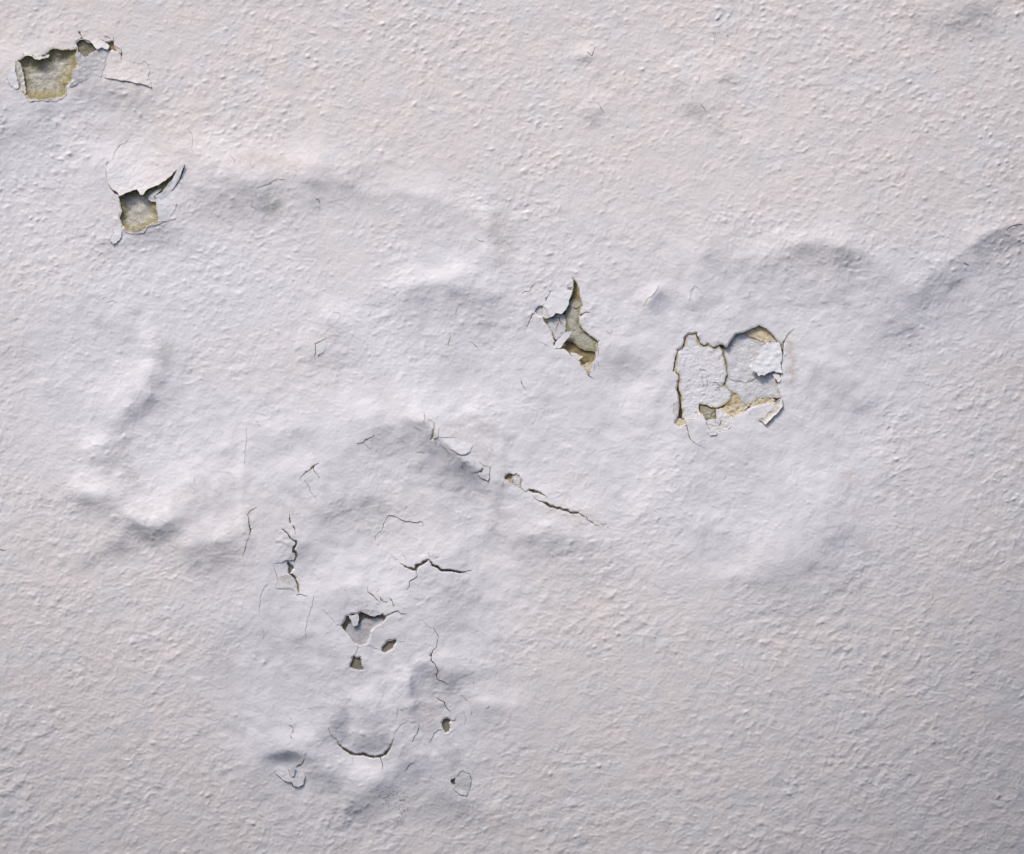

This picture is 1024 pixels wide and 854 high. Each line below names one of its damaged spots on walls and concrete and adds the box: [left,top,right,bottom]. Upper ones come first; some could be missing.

peeling [6,32,151,102]
peeling [106,134,185,248]
peeling [524,277,599,379]
peeling [672,325,792,446]
crack [419,414,491,481]
crack [533,496,603,525]
crack [340,555,470,605]
peeling [323,604,404,670]
crack [423,621,489,712]
crack [329,710,419,769]